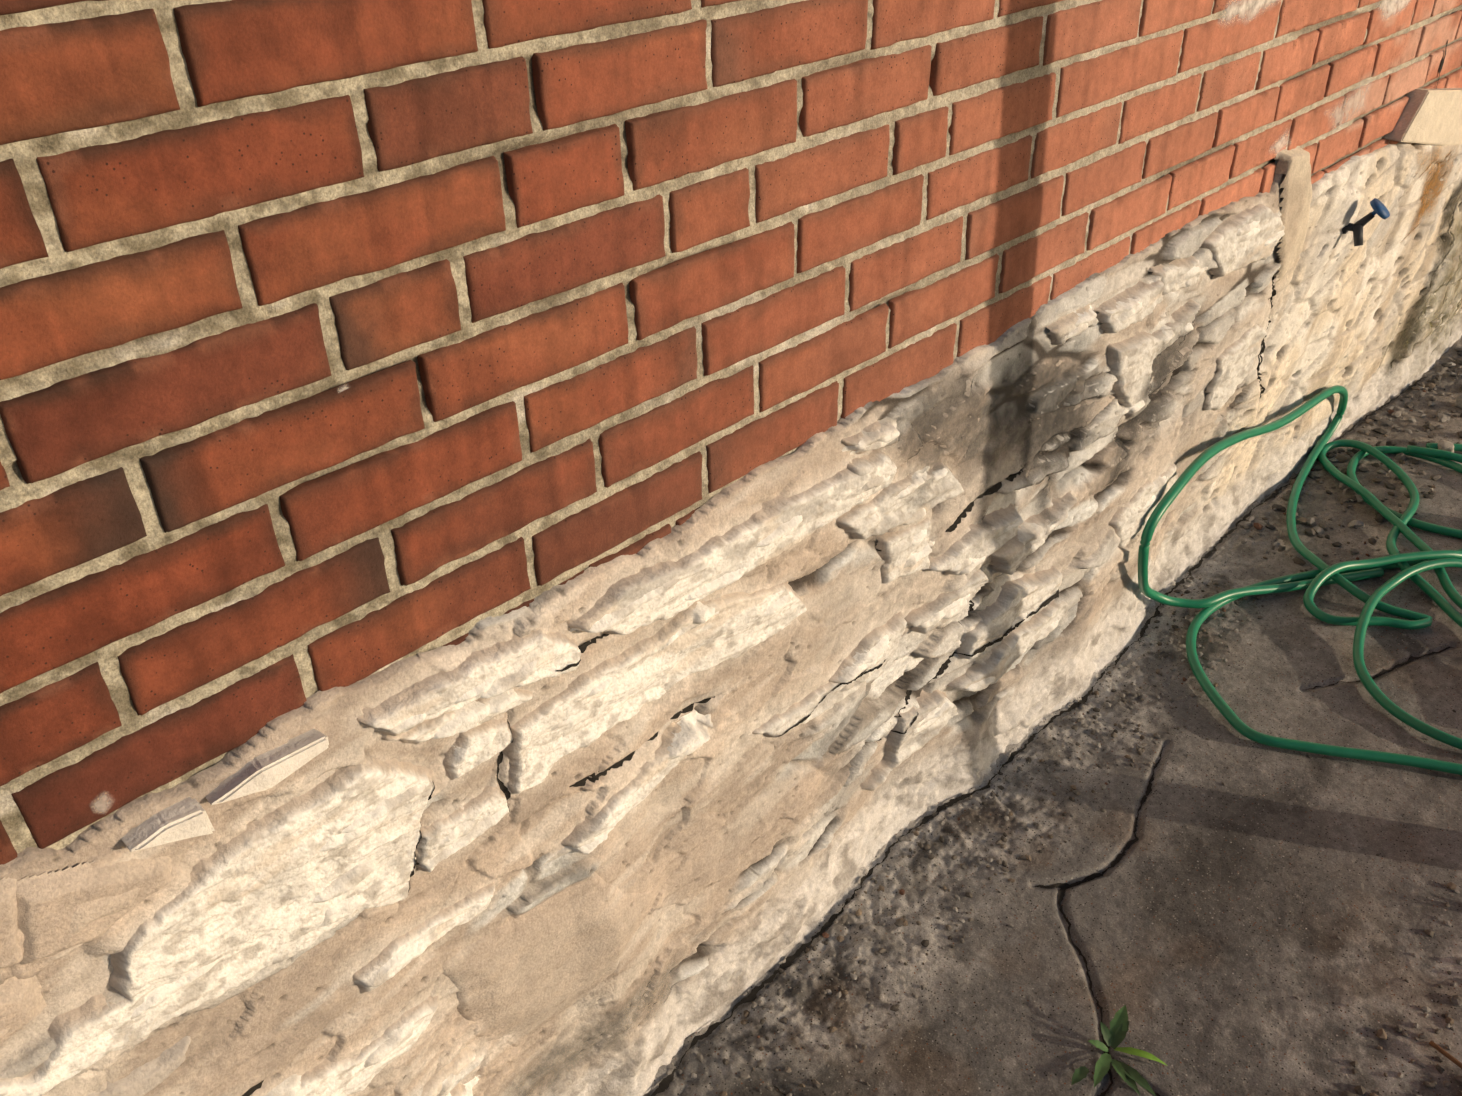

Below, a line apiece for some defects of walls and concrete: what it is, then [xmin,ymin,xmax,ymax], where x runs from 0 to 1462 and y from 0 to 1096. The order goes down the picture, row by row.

water stain [1226,0,1275,19]
water stain [1382,0,1409,17]
water stain [1390,184,1462,367]
crack [1257,275,1276,398]
water stain [1111,321,1194,478]
crack [556,634,612,672]
crack [1307,646,1453,690]
crack [497,712,513,812]
crack [569,696,715,787]
crack [651,377,1426,1096]
crack [242,1079,265,1096]